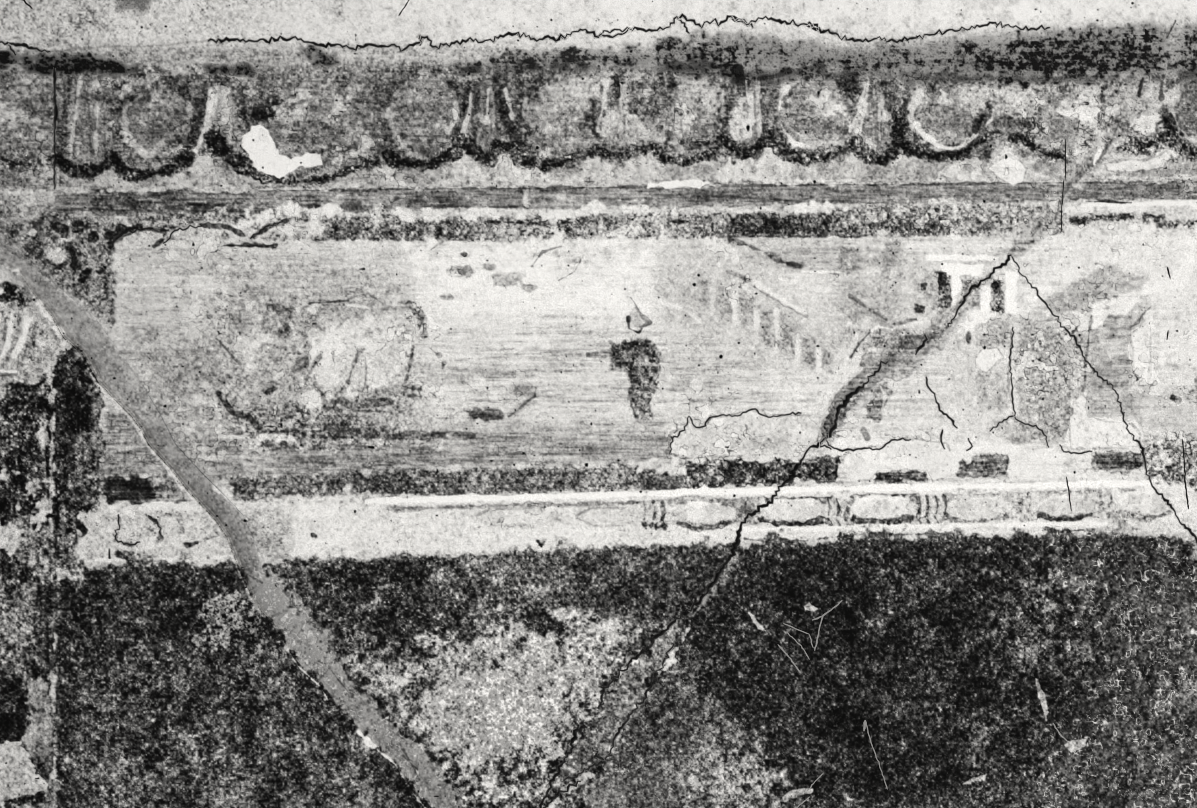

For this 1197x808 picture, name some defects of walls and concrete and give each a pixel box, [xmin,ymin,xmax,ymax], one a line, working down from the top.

spalling [242,125,322,178]
crack [110,224,201,250]
crack [250,220,283,239]
crack [114,515,162,547]
crack [538,254,1197,808]